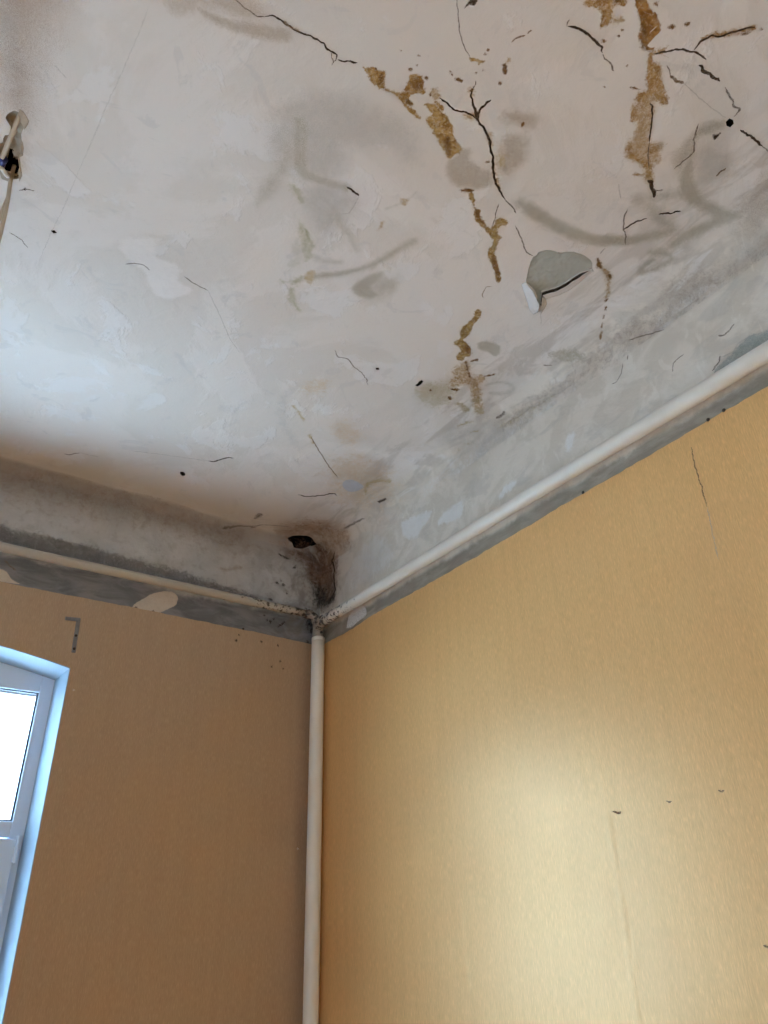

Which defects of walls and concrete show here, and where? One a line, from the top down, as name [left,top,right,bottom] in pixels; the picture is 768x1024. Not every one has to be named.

crack [236,0,357,65]
crack [566,19,614,71]
crack [439,1,533,256]
crack [618,24,768,245]
water stain [0,459,274,601]
water stain [267,516,356,643]
crack [691,447,718,557]